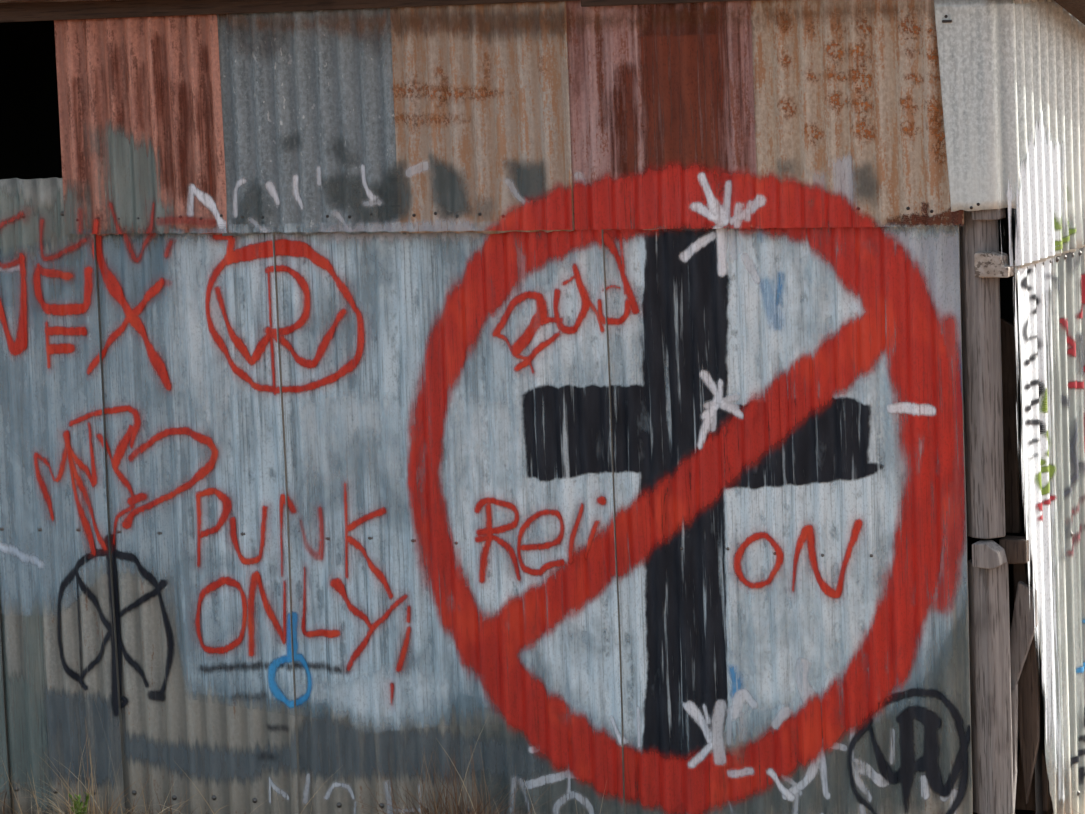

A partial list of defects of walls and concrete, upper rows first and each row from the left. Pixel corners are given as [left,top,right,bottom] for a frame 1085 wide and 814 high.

rust [153,35,213,199]
rust [393,68,497,126]
rust [611,3,741,178]
rust [807,18,875,139]
rust [898,16,940,84]
rust [900,96,946,163]
rust [887,202,963,226]